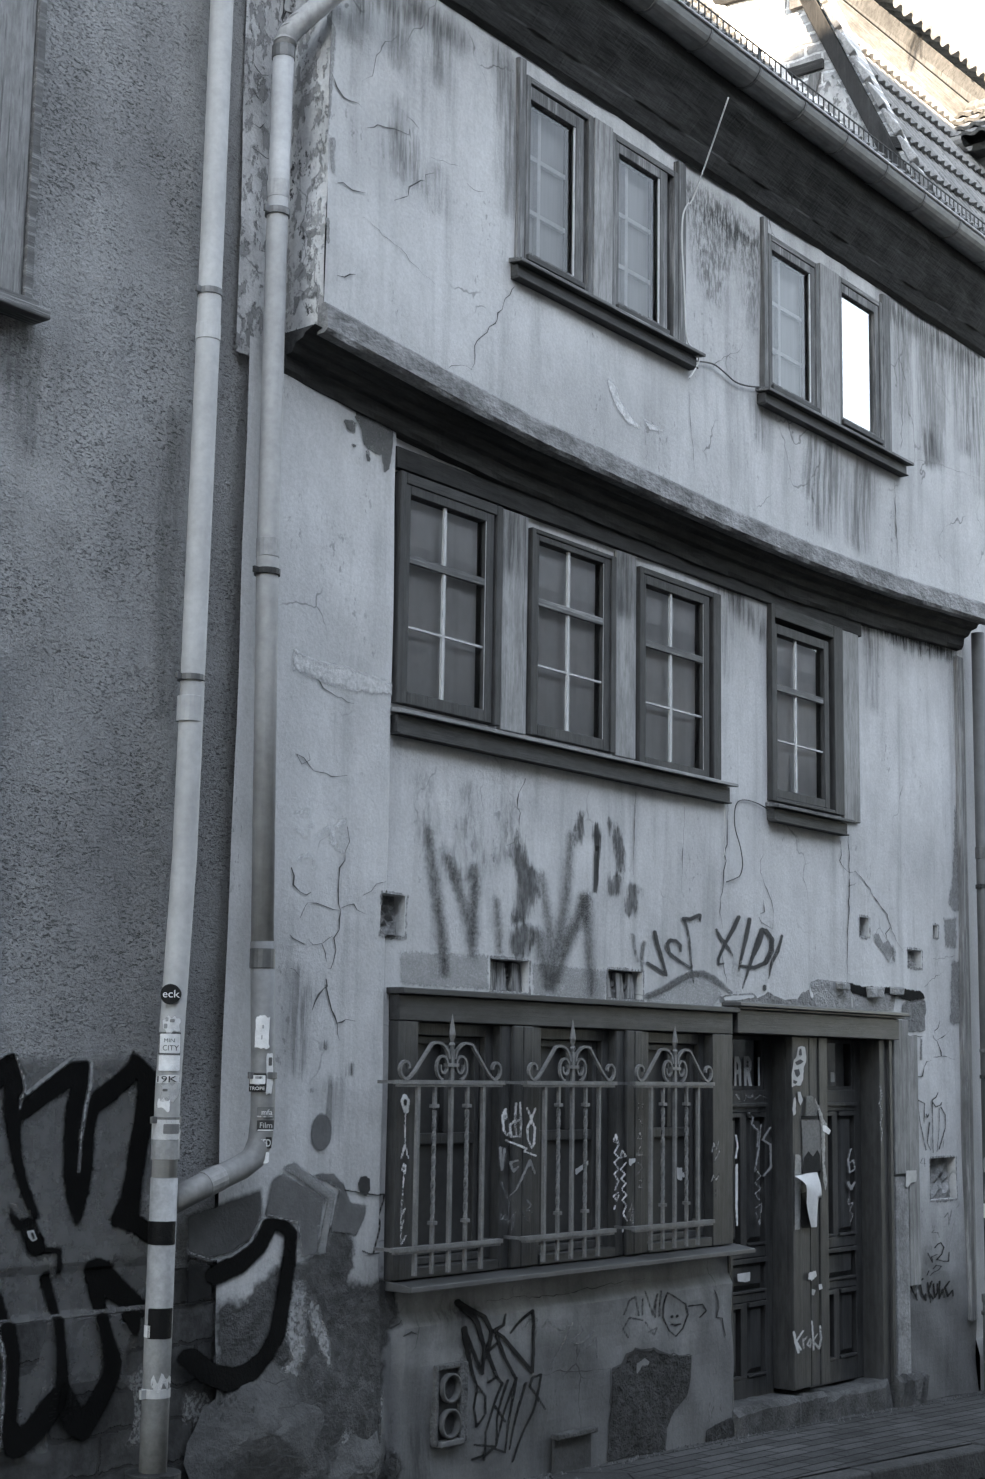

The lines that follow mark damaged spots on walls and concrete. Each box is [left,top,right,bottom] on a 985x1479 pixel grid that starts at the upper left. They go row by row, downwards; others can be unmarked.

crack [332,0,437,137]
peeling [299,217,330,280]
crack [339,160,480,282]
crack [449,287,514,380]
peeling [344,412,393,471]
crack [290,827,383,1038]
peeling [215,1227,402,1479]
spalling [607,1347,692,1462]